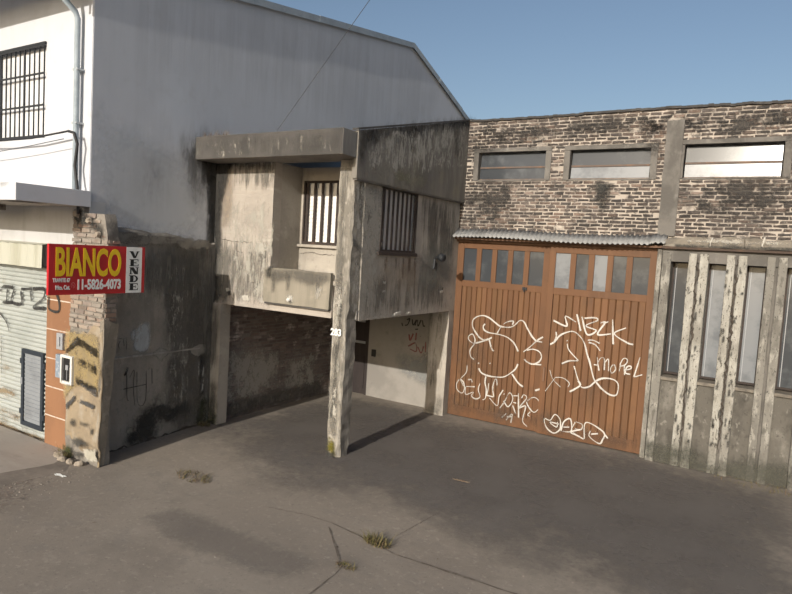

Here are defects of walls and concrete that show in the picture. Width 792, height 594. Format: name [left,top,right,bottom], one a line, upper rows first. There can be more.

damp [472,124,556,150]
damp [567,118,667,151]
damp [685,111,792,134]
damp [466,183,512,222]
damp [698,181,792,219]
damp [189,148,244,300]
flaking render [69,294,117,329]
damp [129,250,215,444]
spalling [72,439,98,462]
damp [226,348,792,594]
crack [269,498,517,594]